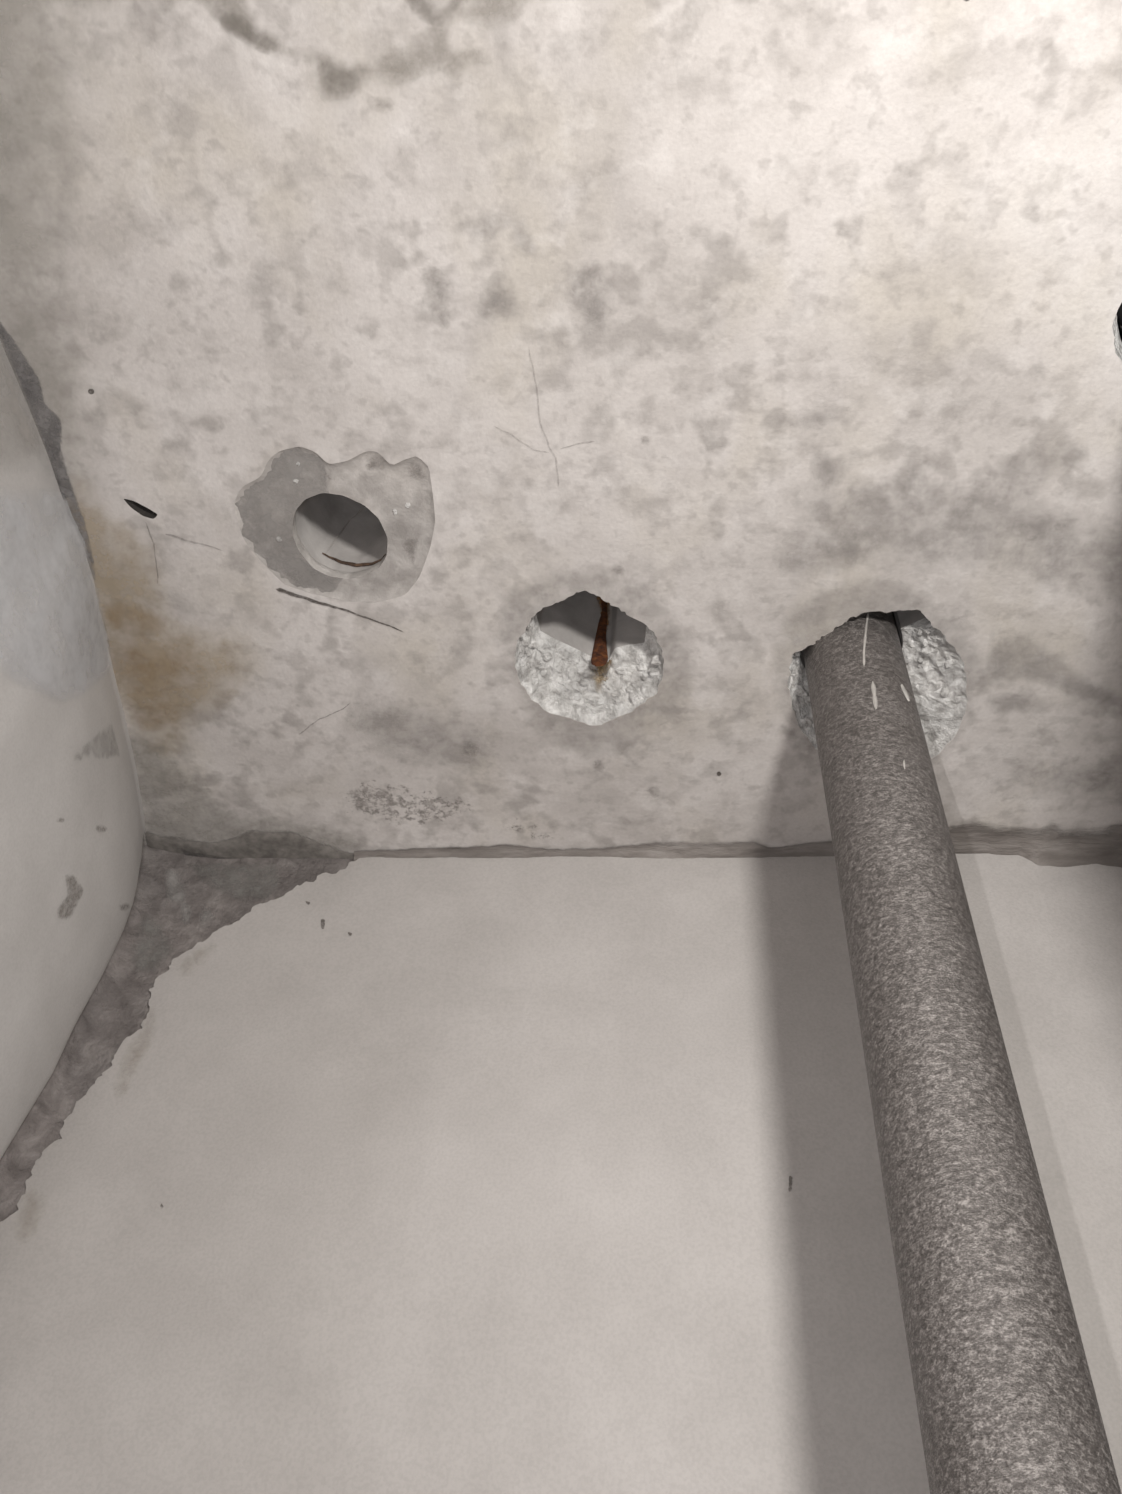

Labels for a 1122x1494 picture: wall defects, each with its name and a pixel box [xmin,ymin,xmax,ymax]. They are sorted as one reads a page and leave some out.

spalling [1112,314,1122,361]
spalling [234,447,435,602]
spalling [515,590,664,726]
corrosion [591,596,611,681]
spalling [787,650,818,750]
spalling [892,609,968,758]
peeling [0,830,354,1222]